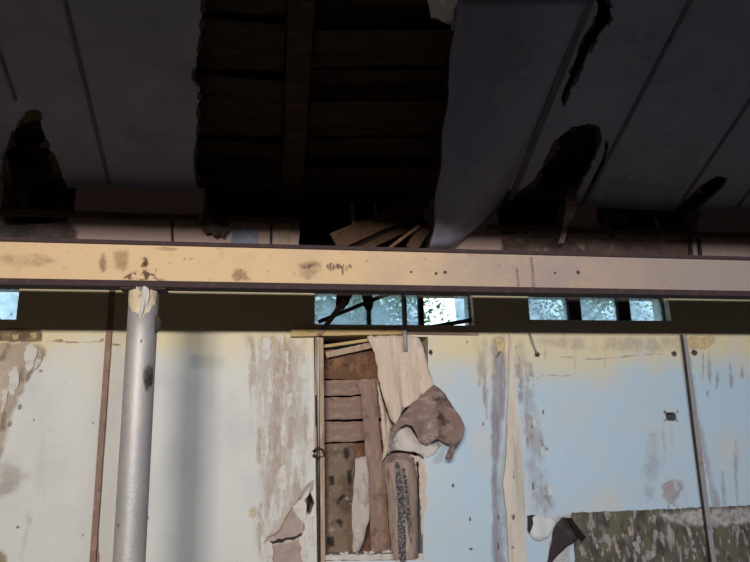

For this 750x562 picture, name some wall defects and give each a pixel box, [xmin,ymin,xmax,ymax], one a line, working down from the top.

peeling [128,286,157,318]
corrosion [125,258,161,281]
flaking render [0,329,45,455]
water stain [479,347,505,459]
flaking render [263,480,314,562]
water stain [493,471,504,562]
water stain [553,546,570,562]
peeling [547,505,750,562]